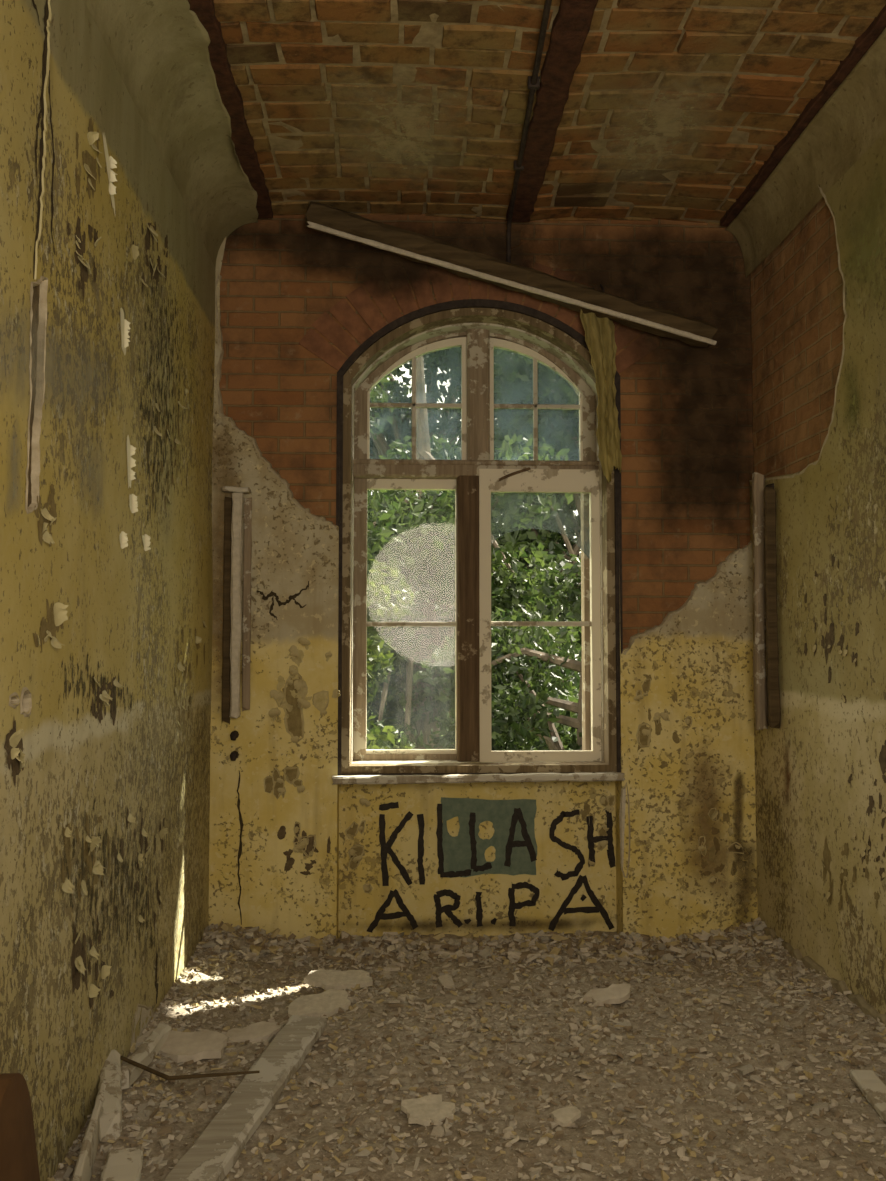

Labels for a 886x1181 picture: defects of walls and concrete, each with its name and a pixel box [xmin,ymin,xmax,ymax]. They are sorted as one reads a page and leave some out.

crack [32,0,55,280]
peeling [75,117,118,199]
leakage [133,260,196,545]
flaking render [215,215,585,528]
flaking render [359,186,847,655]
peeling [4,687,32,785]
leakage [57,653,138,724]
peeling [90,676,125,725]
crack [257,581,309,620]
peeling [804,594,859,683]
leakage [51,796,165,972]
peeling [821,740,886,931]